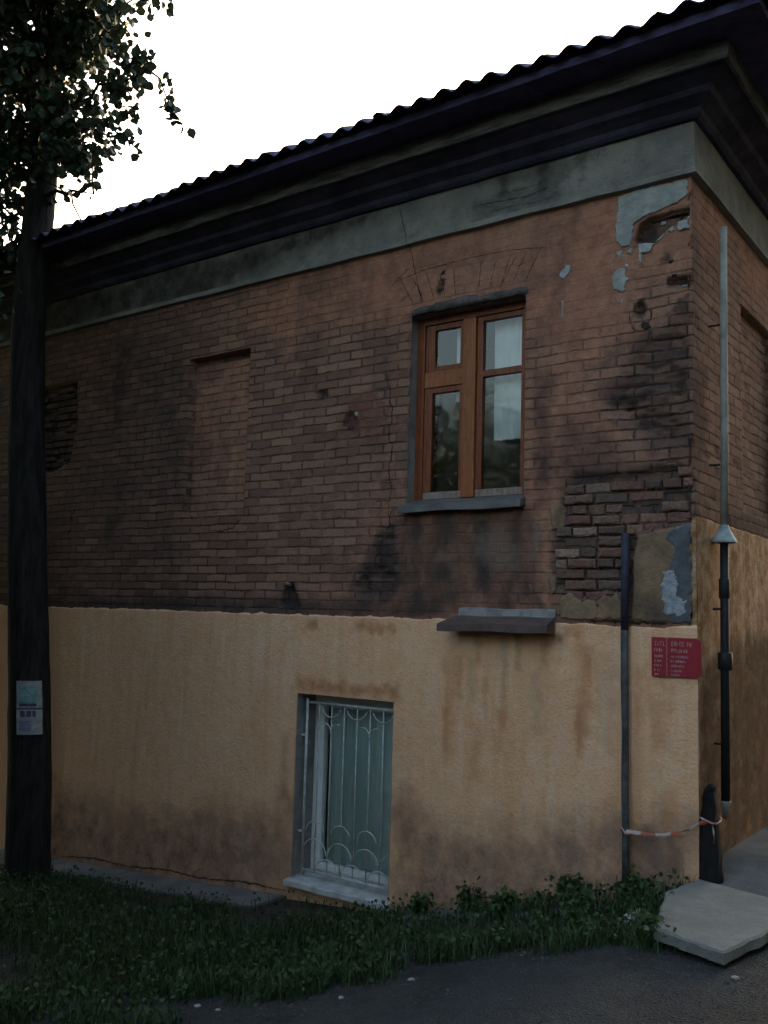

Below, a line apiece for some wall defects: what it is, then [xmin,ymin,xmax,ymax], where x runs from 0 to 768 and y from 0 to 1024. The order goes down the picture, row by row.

peeling [612,179,692,303]
crack [373,376,398,568]
spalling [548,462,694,623]
leakage [51,805,275,887]
crack [58,855,286,891]